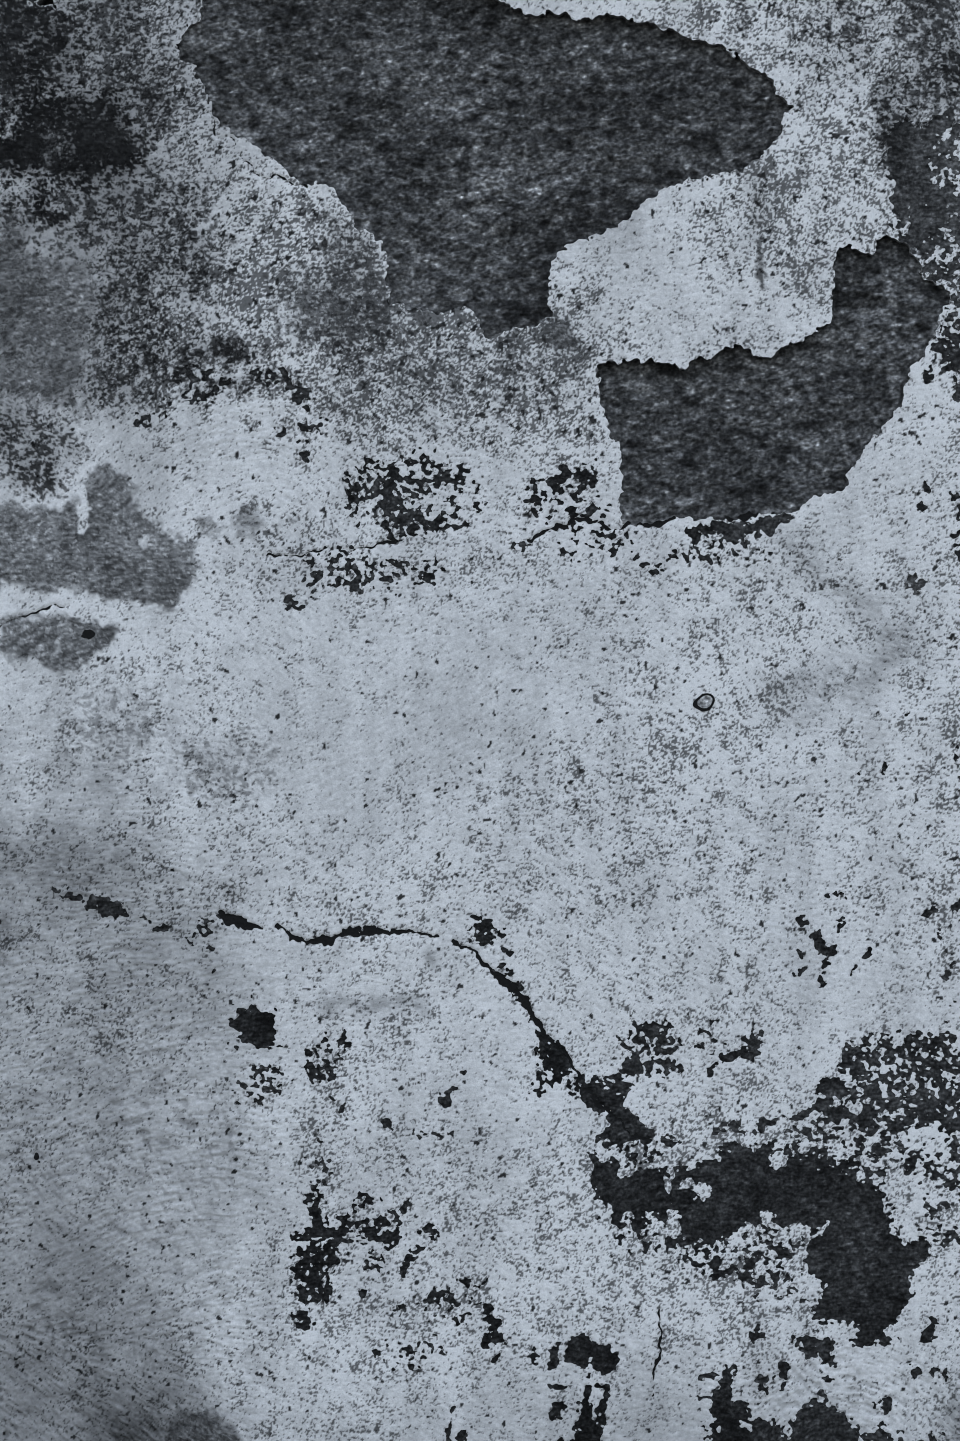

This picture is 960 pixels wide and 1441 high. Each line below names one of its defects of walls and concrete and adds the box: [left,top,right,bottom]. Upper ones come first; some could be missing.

spalling [176,0,794,339]
water stain [0,0,587,611]
spalling [523,108,960,576]
crack [0,604,64,627]
water stain [0,613,119,671]
peeling [283,447,488,611]
peeling [225,995,352,1113]
crack [218,909,650,1140]
water stain [109,1409,238,1441]
peeling [289,1129,440,1331]
peeling [372,1277,508,1371]
peeling [527,1000,960,1441]